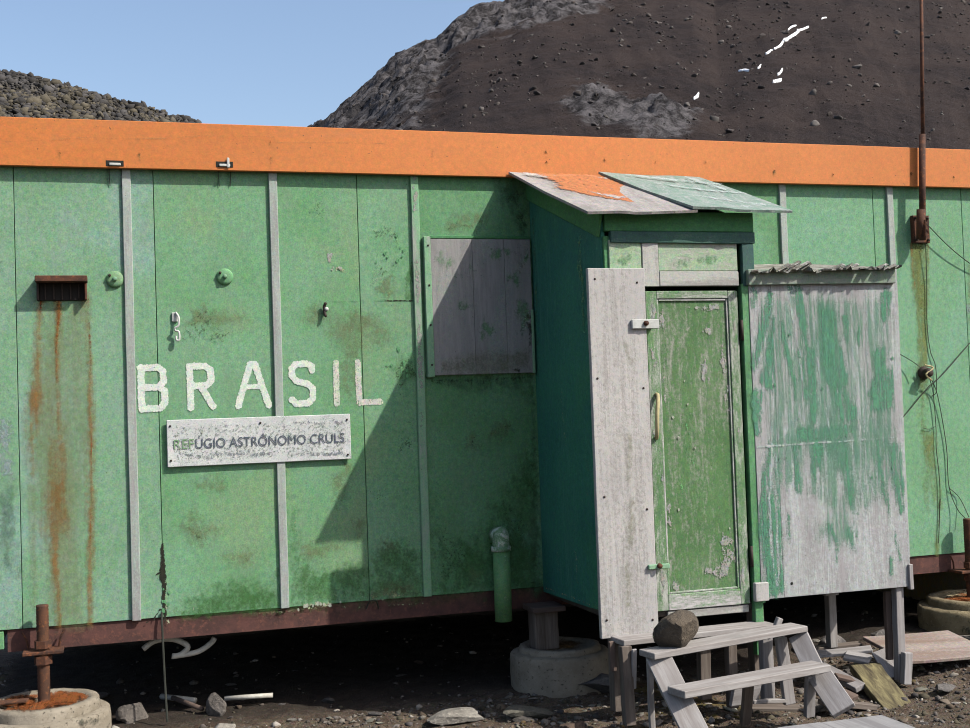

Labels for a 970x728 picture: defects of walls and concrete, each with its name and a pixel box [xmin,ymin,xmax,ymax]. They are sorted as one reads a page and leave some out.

peeling [523,172,767,207]
rust [911,244,928,367]
peeling [750,285,905,598]
crack [146,543,170,623]
peeling [705,523,745,584]
peeling [320,712,400,728]
peeling [913,687,967,704]